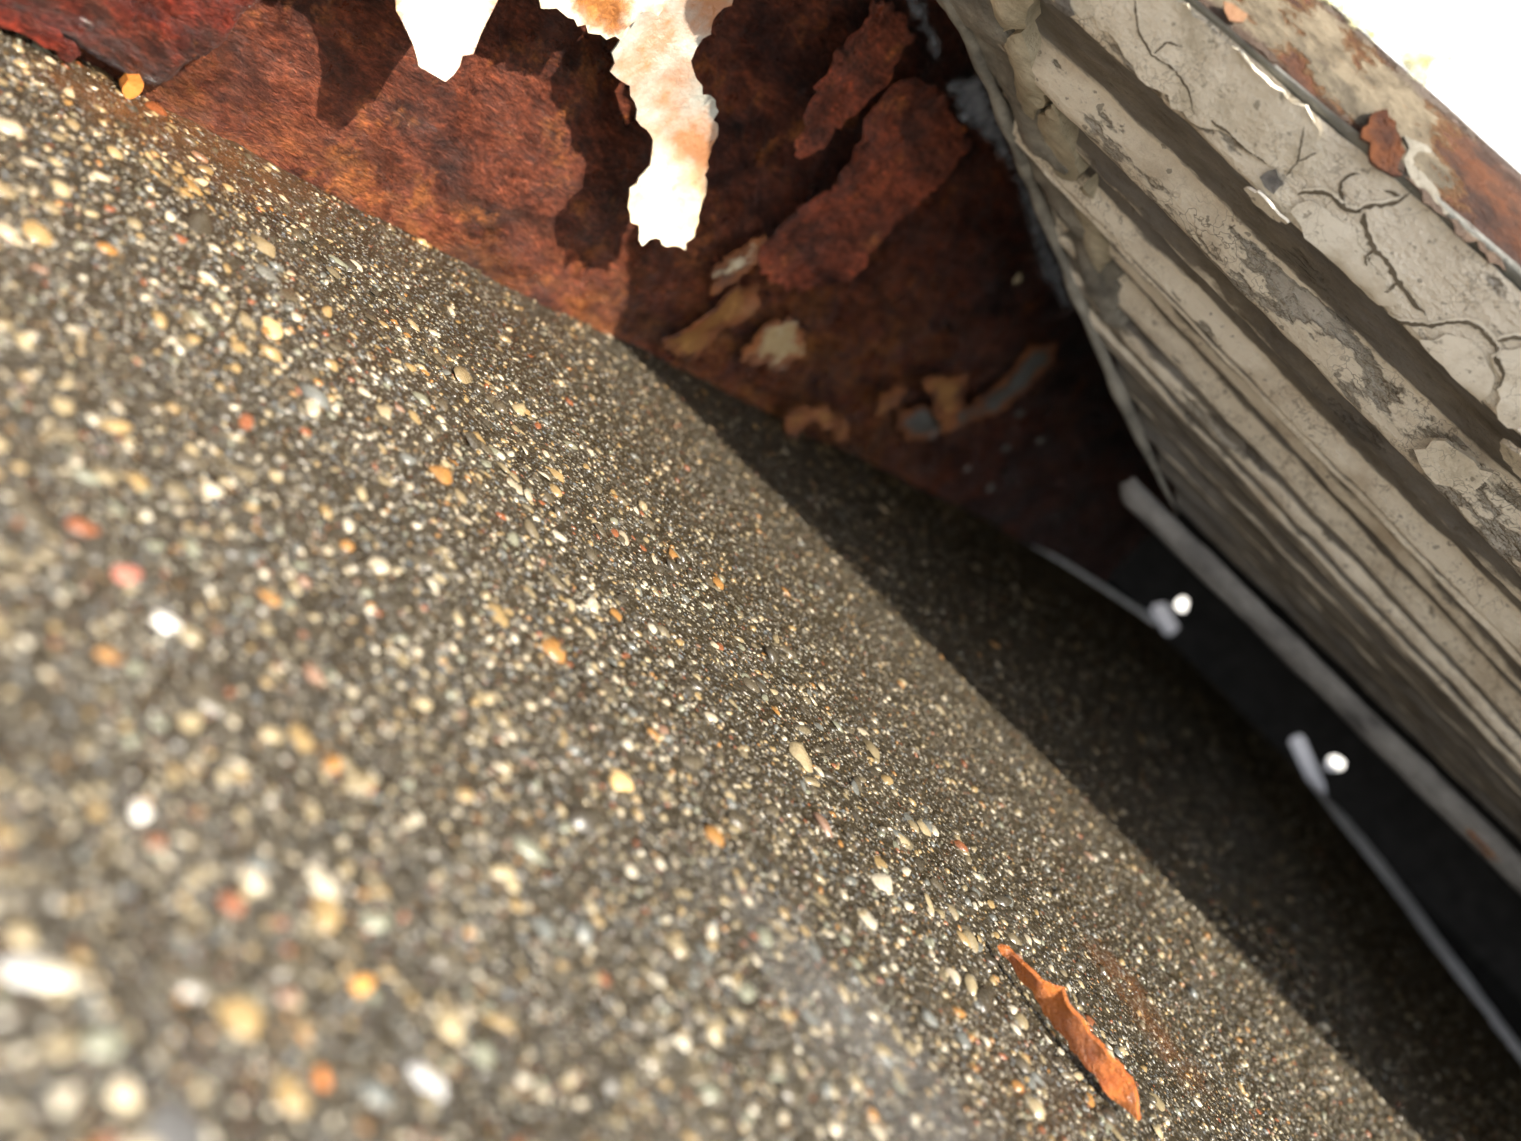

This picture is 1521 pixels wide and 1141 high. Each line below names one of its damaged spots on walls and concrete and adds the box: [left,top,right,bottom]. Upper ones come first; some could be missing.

rust [0,0,81,63]
peeling [395,0,498,82]
rust [578,0,627,31]
peeling [539,0,733,250]
rust [661,0,973,376]
peeling [1044,0,1326,194]
crack [1134,0,1521,396]
peeling [1290,201,1397,306]
rust [1359,109,1406,178]
spalling [1402,136,1517,272]
rust [875,372,969,437]
peeling [1414,334,1521,493]